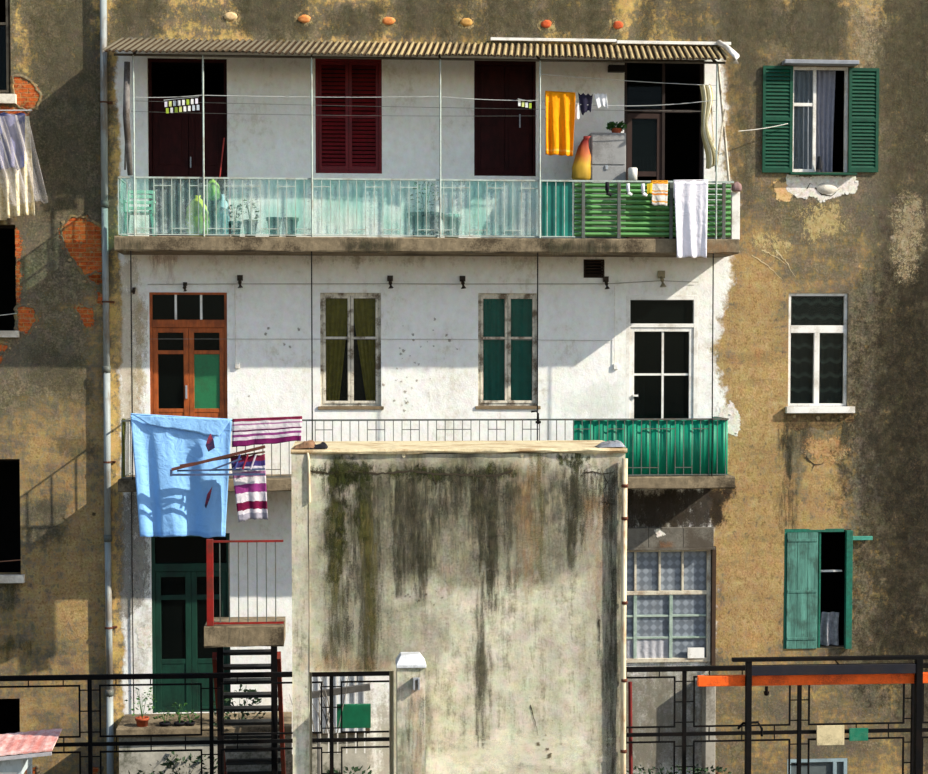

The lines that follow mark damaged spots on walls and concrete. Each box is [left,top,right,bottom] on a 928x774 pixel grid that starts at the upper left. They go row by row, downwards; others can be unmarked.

flaking render [0,74,43,116]
flaking render [13,228,41,336]
flaking render [58,214,103,331]
peeling [751,232,792,262]
spalling [773,174,859,245]
peeling [718,401,741,436]
water stain [321,467,518,745]
water stain [562,468,622,774]